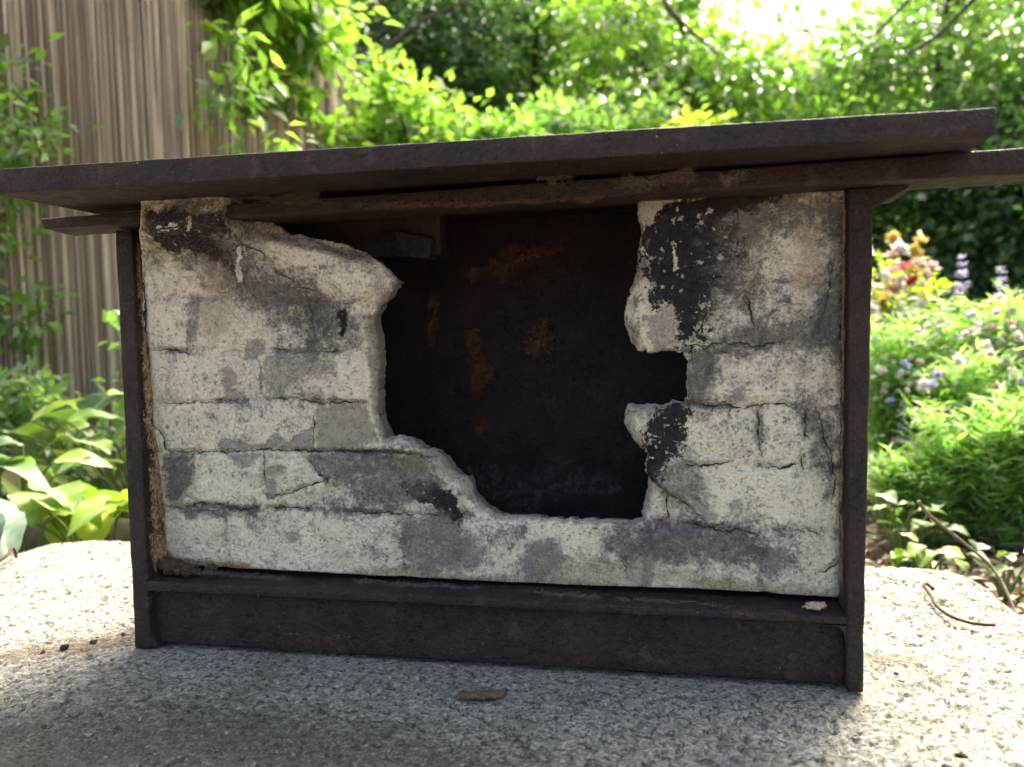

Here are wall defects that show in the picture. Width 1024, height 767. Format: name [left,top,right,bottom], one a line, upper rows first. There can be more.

leakage [156,216,192,232]
corrosion [353,193,613,210]
spalling [646,270,711,350]
crack [692,213,844,583]